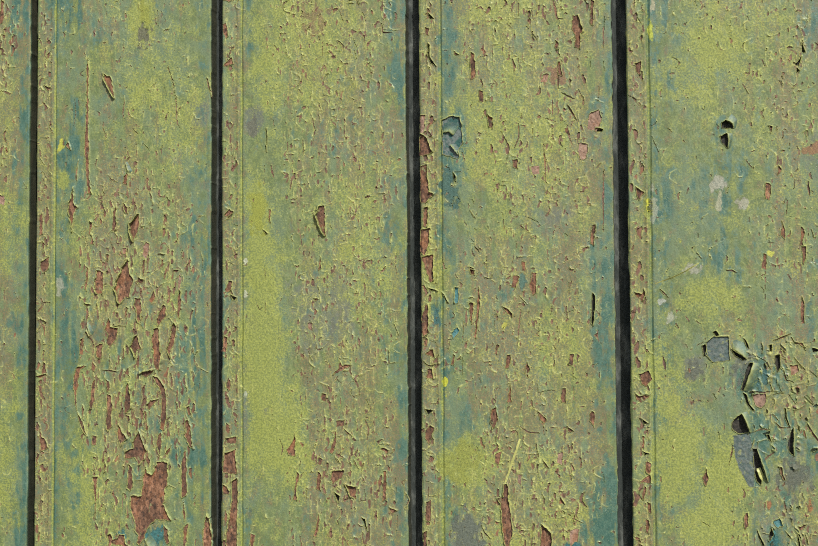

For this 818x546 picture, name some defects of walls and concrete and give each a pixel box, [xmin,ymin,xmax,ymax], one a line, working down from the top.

peeling [720,114,737,149]
peeling [314,205,326,237]
peeling [419,114,481,358]
peeling [73,317,118,445]
peeling [84,202,182,546]
peeling [701,330,770,487]
peeling [784,407,807,456]
peeling [181,406,194,546]
peeling [202,514,213,546]
peeling [497,483,513,546]
peeling [540,523,553,546]